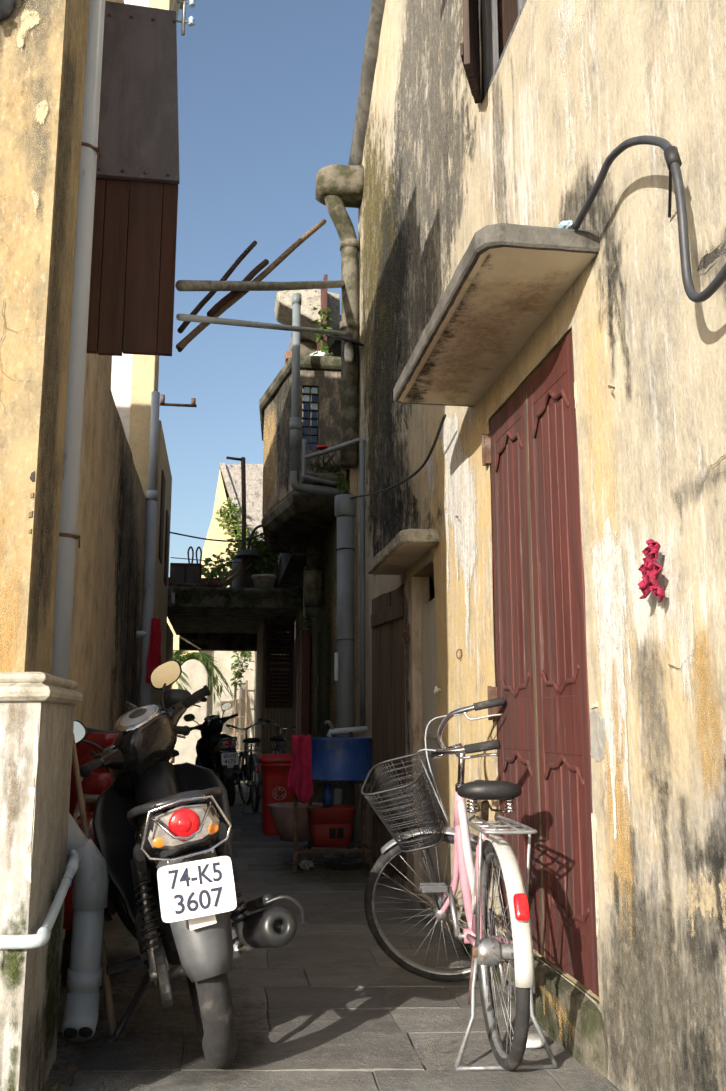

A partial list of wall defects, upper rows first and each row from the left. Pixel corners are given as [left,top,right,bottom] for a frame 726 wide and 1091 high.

flaking render [16,10,40,47]
flaking render [36,100,48,124]
damp [367,0,489,556]
damp [678,593,718,772]
damp [602,647,726,1091]
damp [8,994,58,1091]